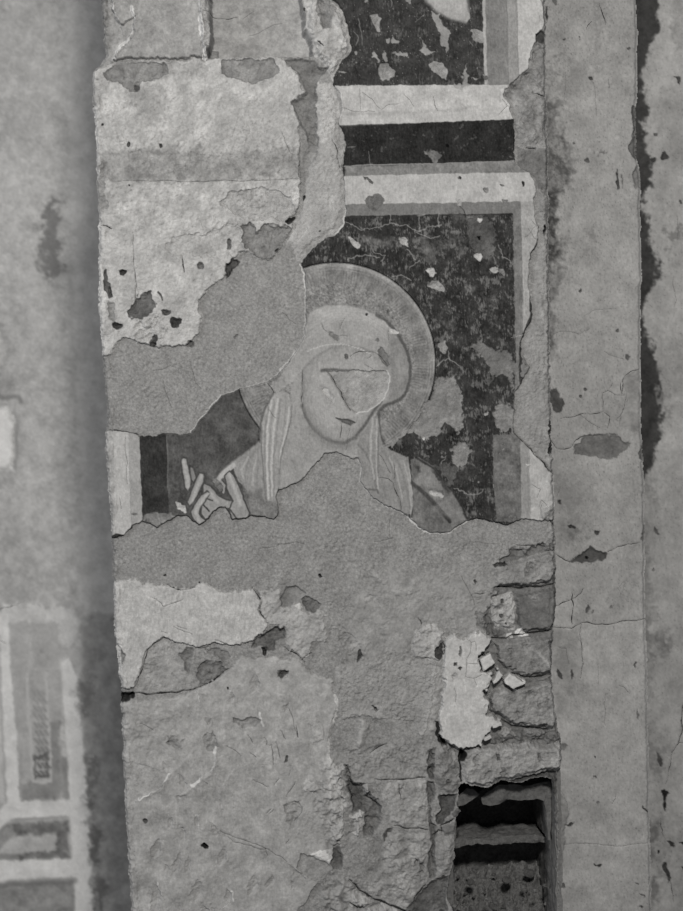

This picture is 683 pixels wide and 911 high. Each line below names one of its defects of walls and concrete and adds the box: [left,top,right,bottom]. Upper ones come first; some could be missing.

spalling [103,57,329,150]
spalling [165,186,306,278]
spalling [127,290,169,350]
crack [514,351,639,524]
spalling [573,370,642,460]
damp [654,384,678,428]
crack [121,637,224,695]
spalling [122,637,231,702]
spalling [251,625,286,651]
spalling [435,721,447,745]
peeling [479,652,544,741]
crack [665,706,683,784]